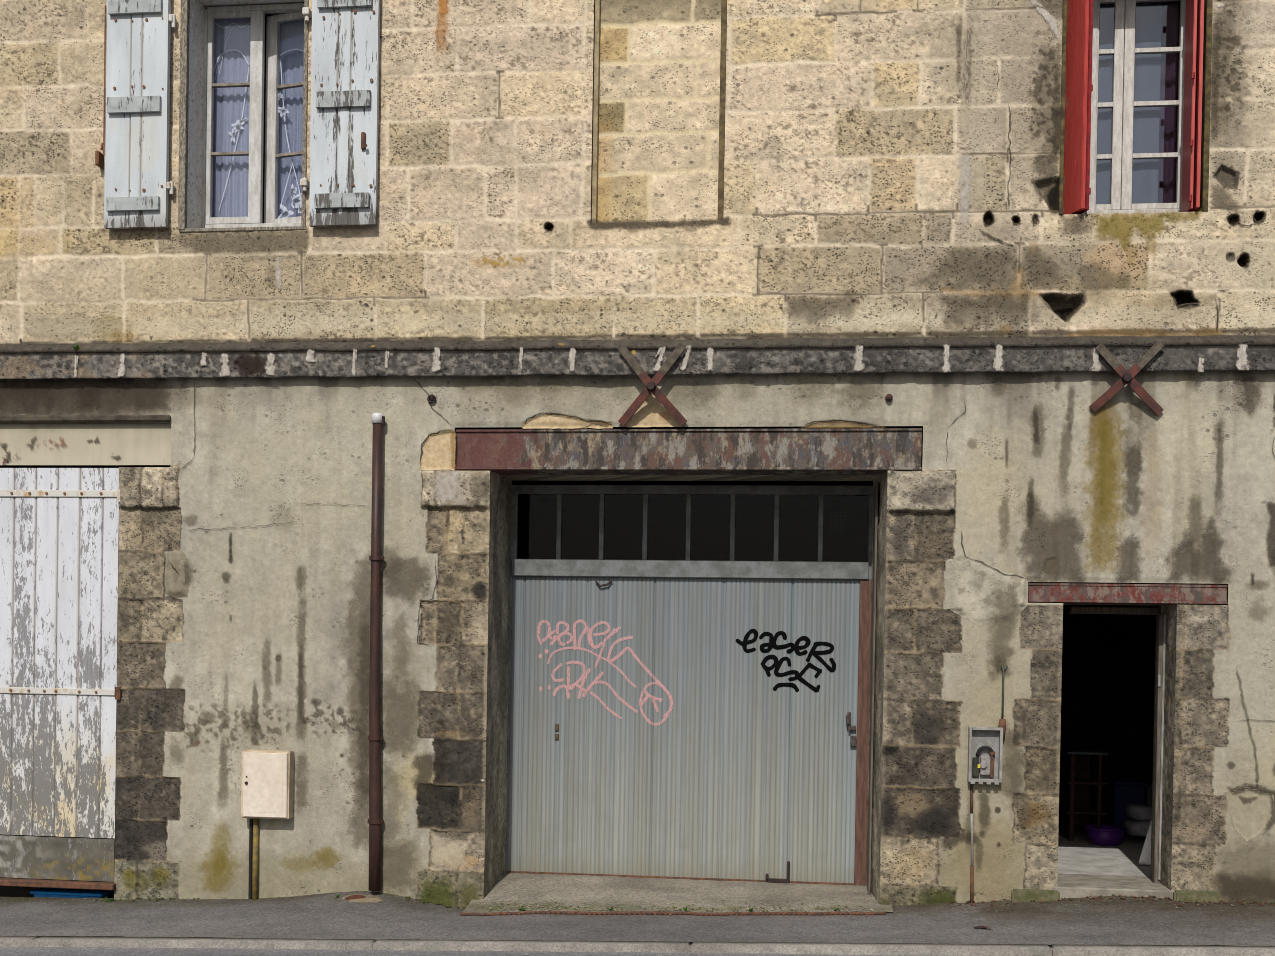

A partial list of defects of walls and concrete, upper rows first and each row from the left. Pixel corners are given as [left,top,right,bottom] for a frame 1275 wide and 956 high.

hole [1040,291,1086,321]
spalling [522,393,685,429]
spalling [420,430,456,470]
water stain [1128,449,1140,512]
crack [961,531,1026,579]
water stain [1025,501,1081,580]
water stain [1175,524,1227,582]
water stain [415,755,439,791]